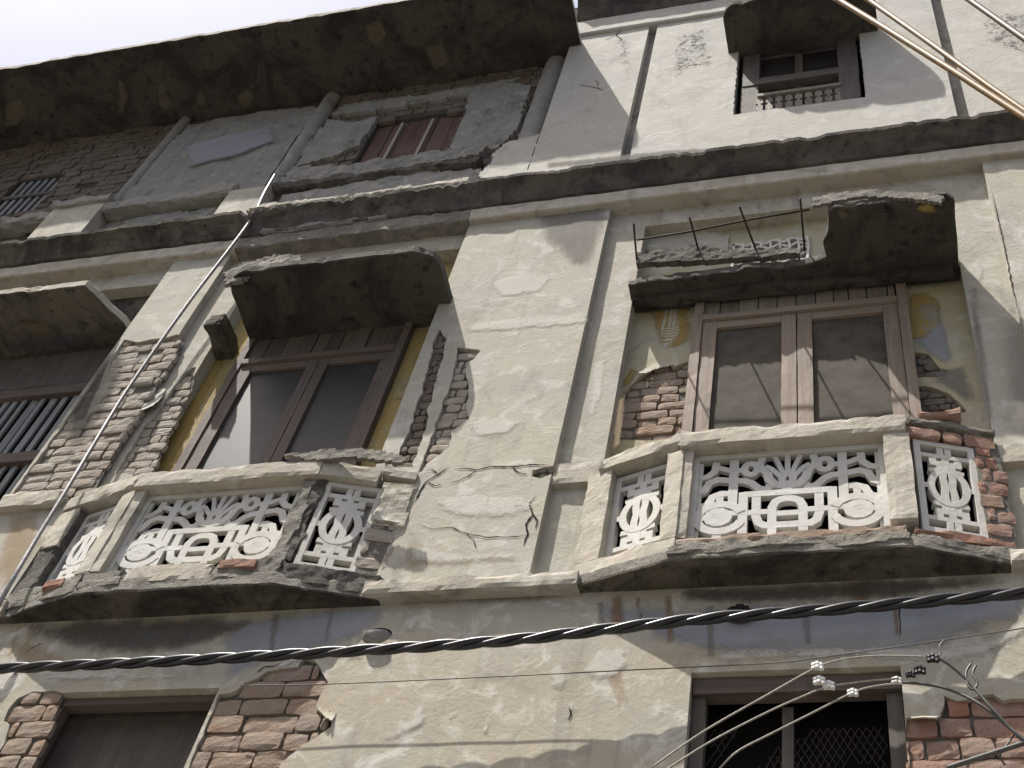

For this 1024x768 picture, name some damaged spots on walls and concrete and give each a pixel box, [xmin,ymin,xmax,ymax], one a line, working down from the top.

spalling [16,335,196,501]
spalling [394,334,478,471]
spalling [619,309,688,441]
peeling [915,304,968,413]
flaking render [906,426,995,459]
crack [414,464,544,546]
spalling [0,692,65,768]
spalling [190,662,336,768]
spalling [905,699,1024,768]